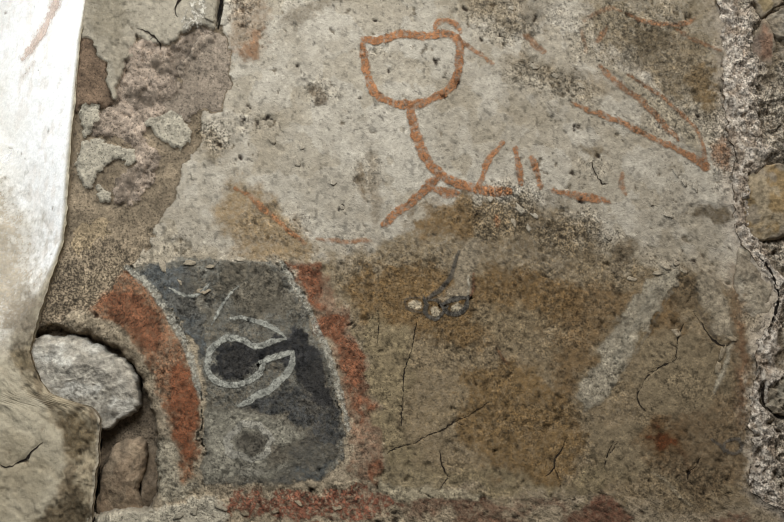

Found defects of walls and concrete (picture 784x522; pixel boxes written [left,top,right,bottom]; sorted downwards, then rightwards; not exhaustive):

crack [215,0,223,27]
flaking render [36,0,233,337]
crack [401,322,417,426]
crack [637,313,729,412]
crack [387,401,490,454]